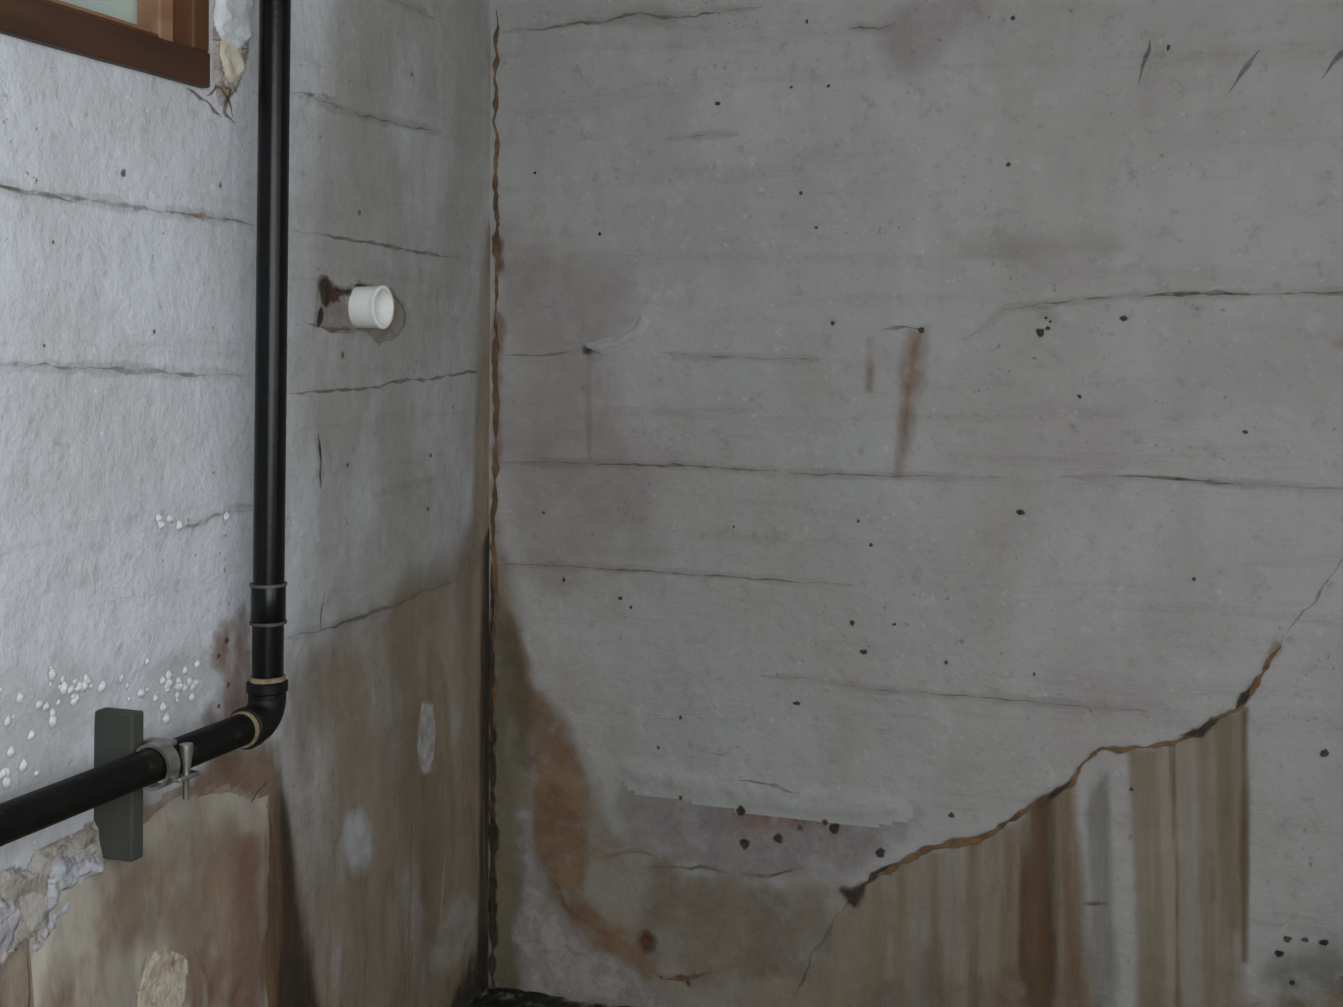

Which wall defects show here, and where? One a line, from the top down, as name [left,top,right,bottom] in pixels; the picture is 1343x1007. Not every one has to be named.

peeling [187,0,254,123]
crack [291,10,637,988]
water stain [198,232,885,1007]
water stain [0,939,34,1007]
peeling [0,759,270,1007]
water stain [1087,785,1109,1006]
water stain [1275,936,1329,957]